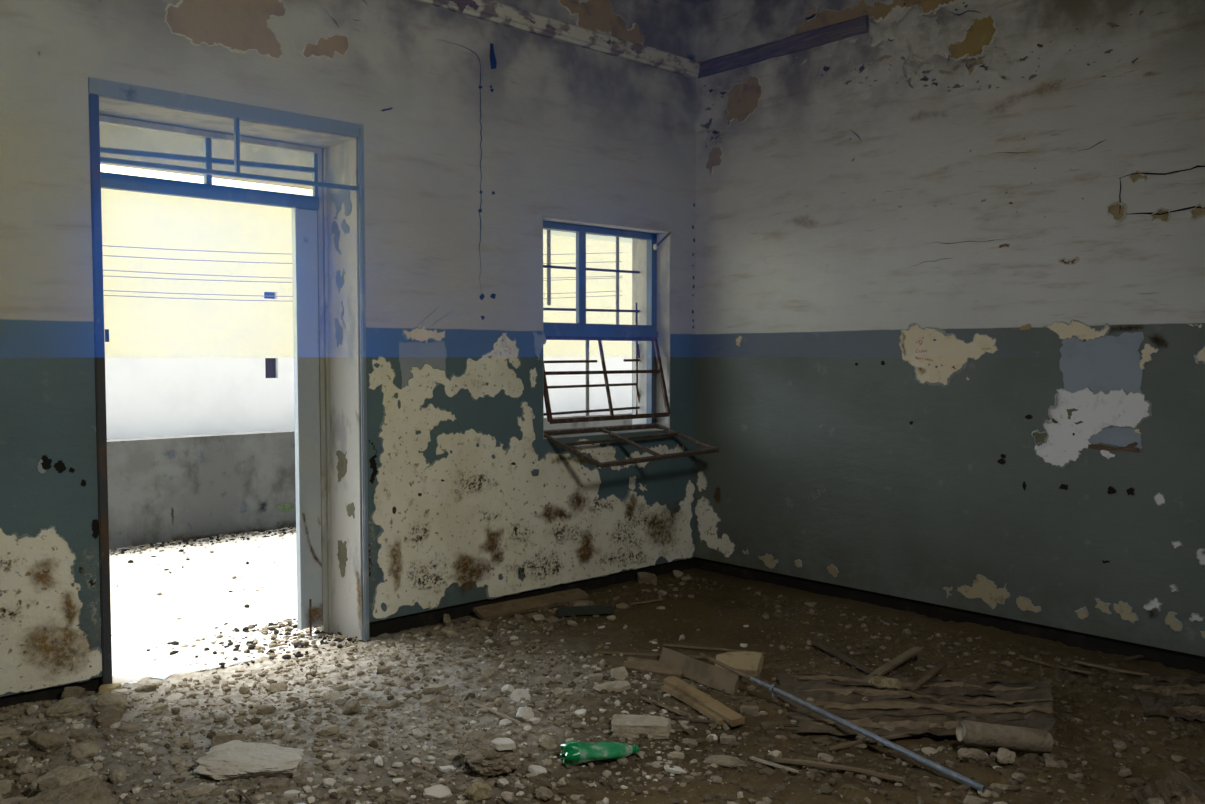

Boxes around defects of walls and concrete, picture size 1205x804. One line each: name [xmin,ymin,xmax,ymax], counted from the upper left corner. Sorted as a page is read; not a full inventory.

peeling [165,0,287,60]
peeling [790,0,1052,94]
crack [1119,165,1205,215]
peeling [899,323,998,387]
peeling [1025,386,1152,468]
water stain [458,473,497,492]
peeling [346,332,779,620]
water stain [626,508,678,545]
peeling [0,525,102,697]
water stain [411,565,445,589]
water stain [517,562,559,579]
peeling [943,574,1041,613]